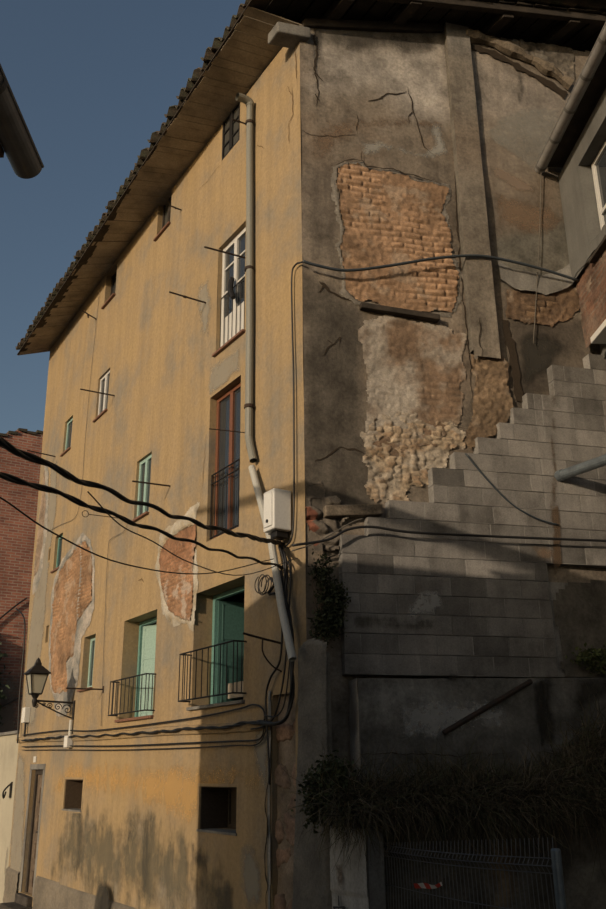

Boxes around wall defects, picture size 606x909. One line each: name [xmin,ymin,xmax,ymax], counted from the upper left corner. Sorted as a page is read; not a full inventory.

crack [287,28,483,400]
flaking render [305,162,513,551]
crack [503,320,524,402]
spalling [498,261,580,327]
flaking render [49,532,95,717]
flaking render [155,502,200,631]
water stain [59,809,232,909]
spalling [267,691,296,909]